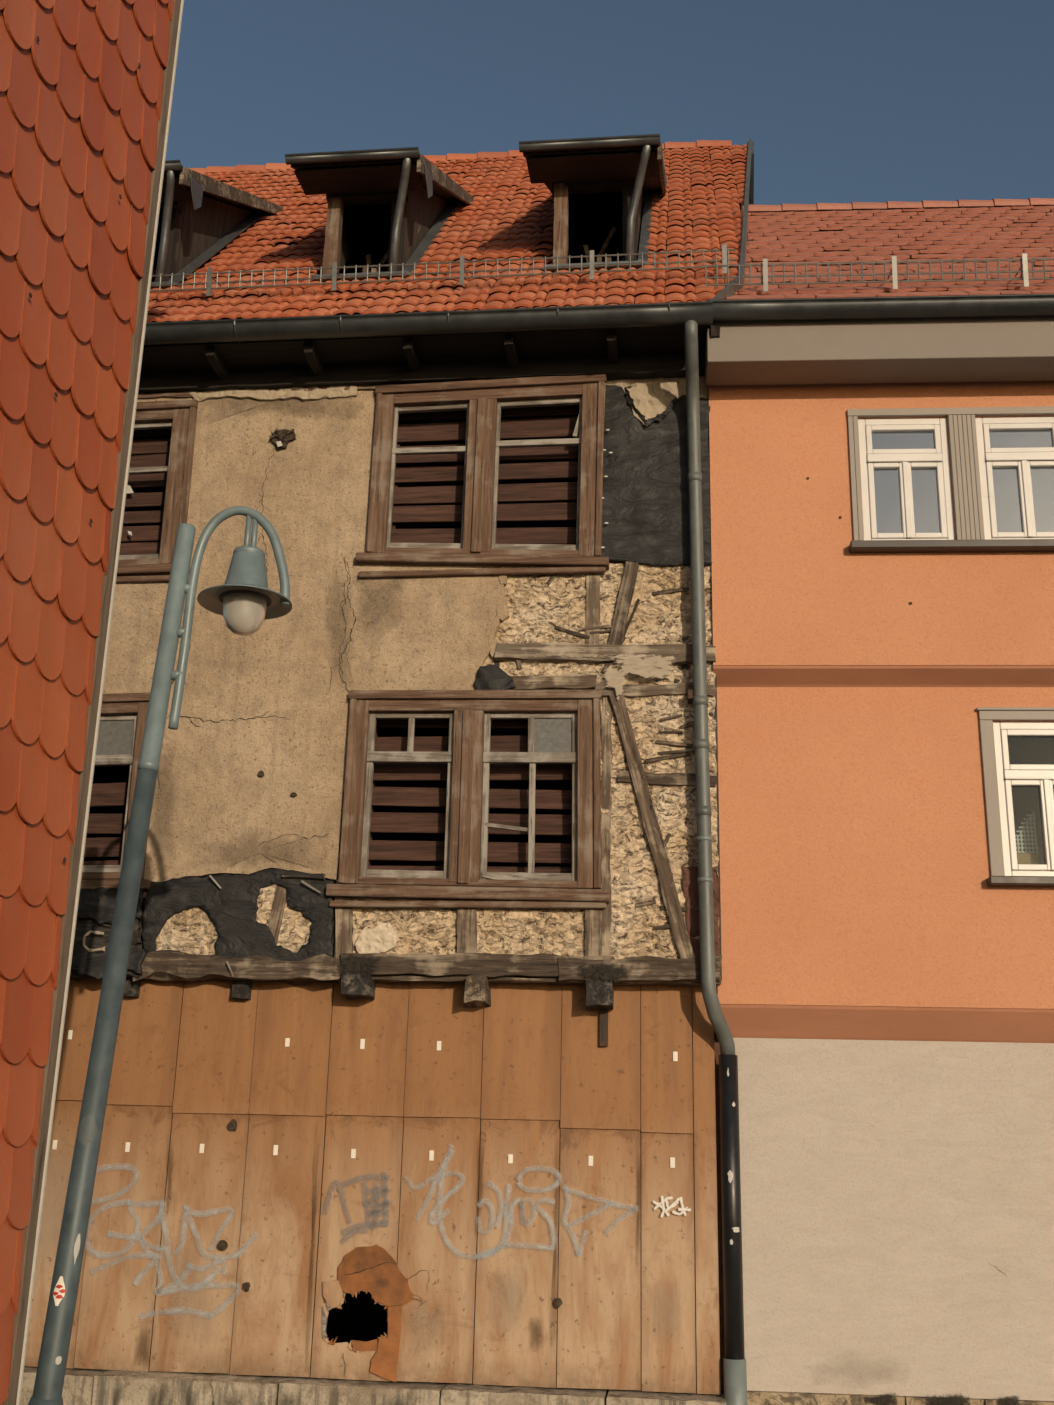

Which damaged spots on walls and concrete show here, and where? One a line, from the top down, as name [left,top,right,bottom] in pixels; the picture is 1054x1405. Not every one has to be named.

spalling [606,376,708,427]
crack [329,557,356,692]
crack [166,680,289,728]
spalling [474,563,720,959]
spalling [155,907,219,955]
spalling [256,883,312,952]
spalling [352,898,458,955]
spalling [322,1244,414,1382]
damp [864,1393,898,1405]
damp [926,1394,970,1405]
damp [998,1396,1021,1405]